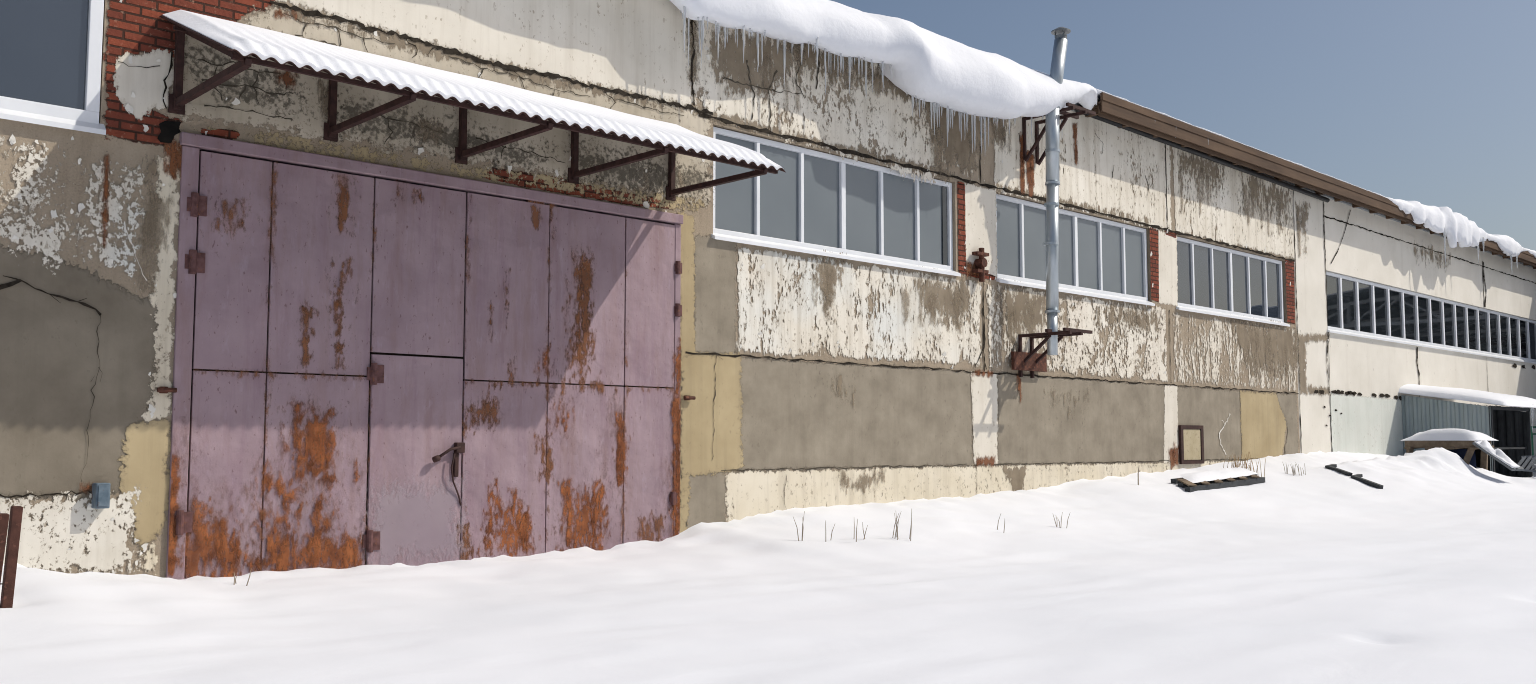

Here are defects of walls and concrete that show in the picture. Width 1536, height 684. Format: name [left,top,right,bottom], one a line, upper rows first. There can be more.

water stain [291,10,1012,182]
rust [337,175,377,262]
peeling [0,0,1402,426]
water stain [1242,176,1311,256]
crack [0,275,102,498]
rust [295,258,371,392]
rust [457,188,681,560]
water stain [813,250,846,322]
water stain [901,270,975,333]
water stain [1231,318,1299,382]
peeling [0,486,158,575]
rust [168,362,365,577]